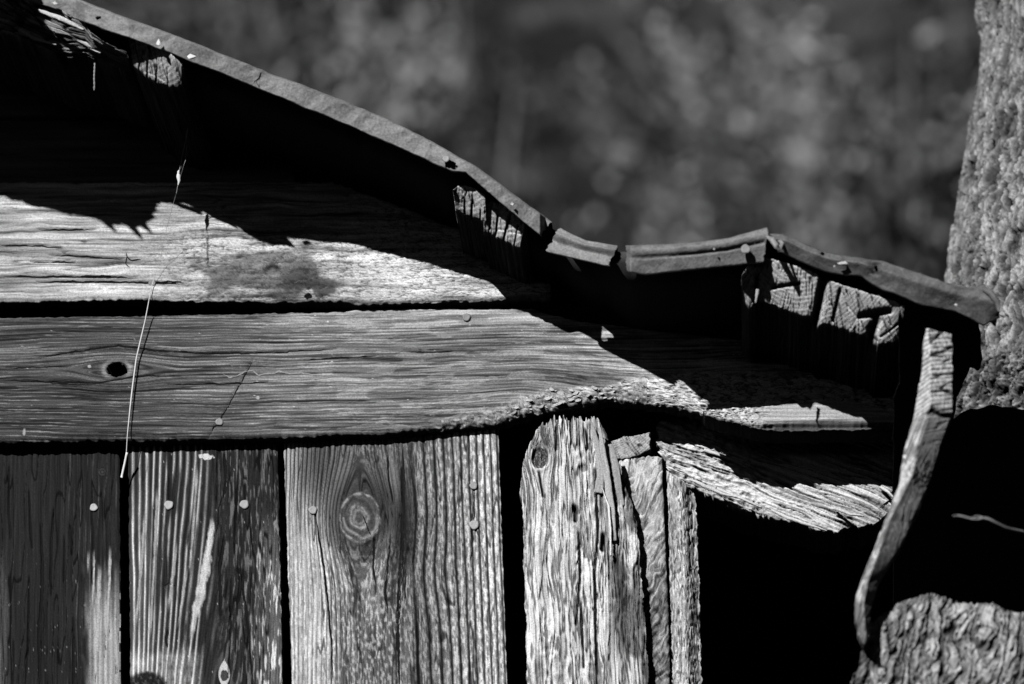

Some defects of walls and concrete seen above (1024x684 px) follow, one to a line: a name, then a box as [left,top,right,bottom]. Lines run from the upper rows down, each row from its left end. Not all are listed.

crack [1,344,375,684]